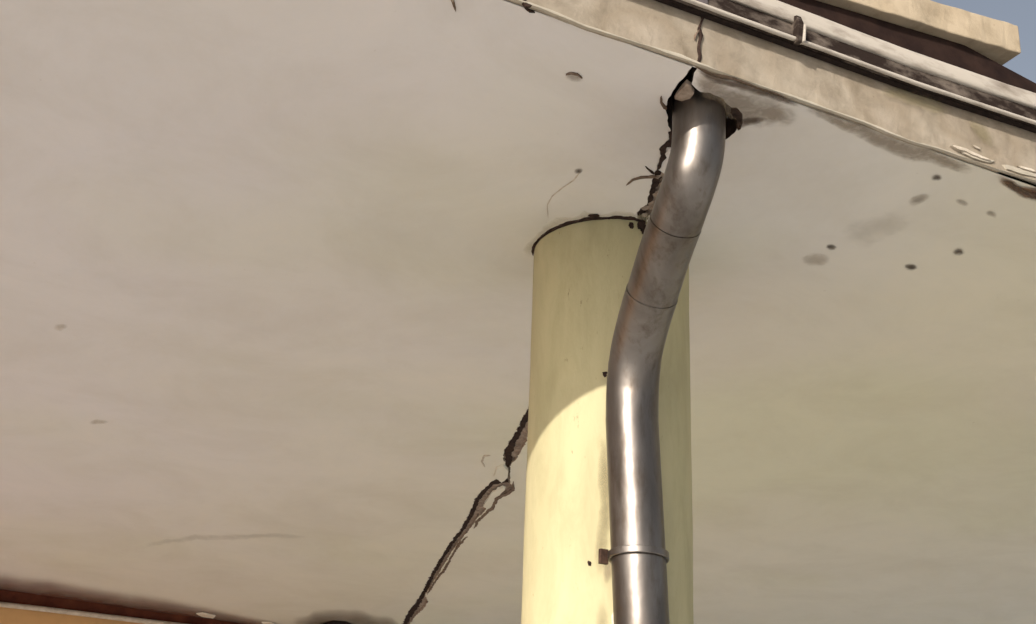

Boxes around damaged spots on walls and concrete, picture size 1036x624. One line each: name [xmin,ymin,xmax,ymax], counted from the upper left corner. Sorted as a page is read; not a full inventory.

crack [694,17,704,62]
crack [660,96,672,142]
crack [730,108,743,130]
damp [695,67,793,127]
damp [826,114,956,167]
crack [403,407,529,624]